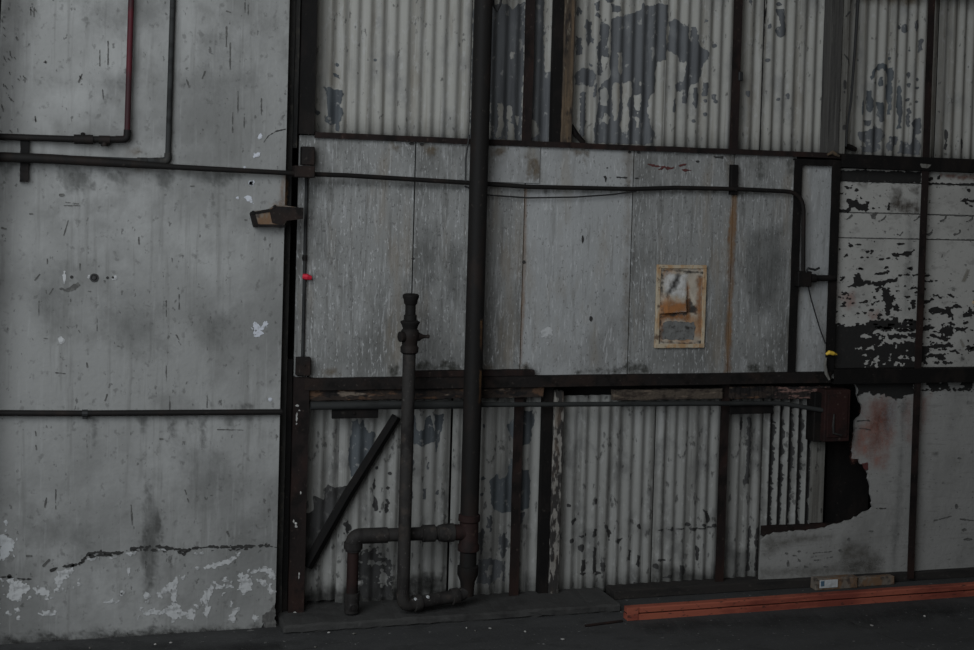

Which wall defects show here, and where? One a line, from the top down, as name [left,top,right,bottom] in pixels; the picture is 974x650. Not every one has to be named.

peeling [489,0,551,142]
peeling [574,0,718,154]
corrosion [728,197,736,258]
peeling [834,57,974,368]
peeling [413,414,444,452]
peeling [507,410,535,445]
peeling [476,459,531,585]
peeling [745,406,811,571]
flaking render [0,567,82,620]
crack [1,543,277,580]
flaking render [137,552,277,623]
peeling [358,546,393,600]